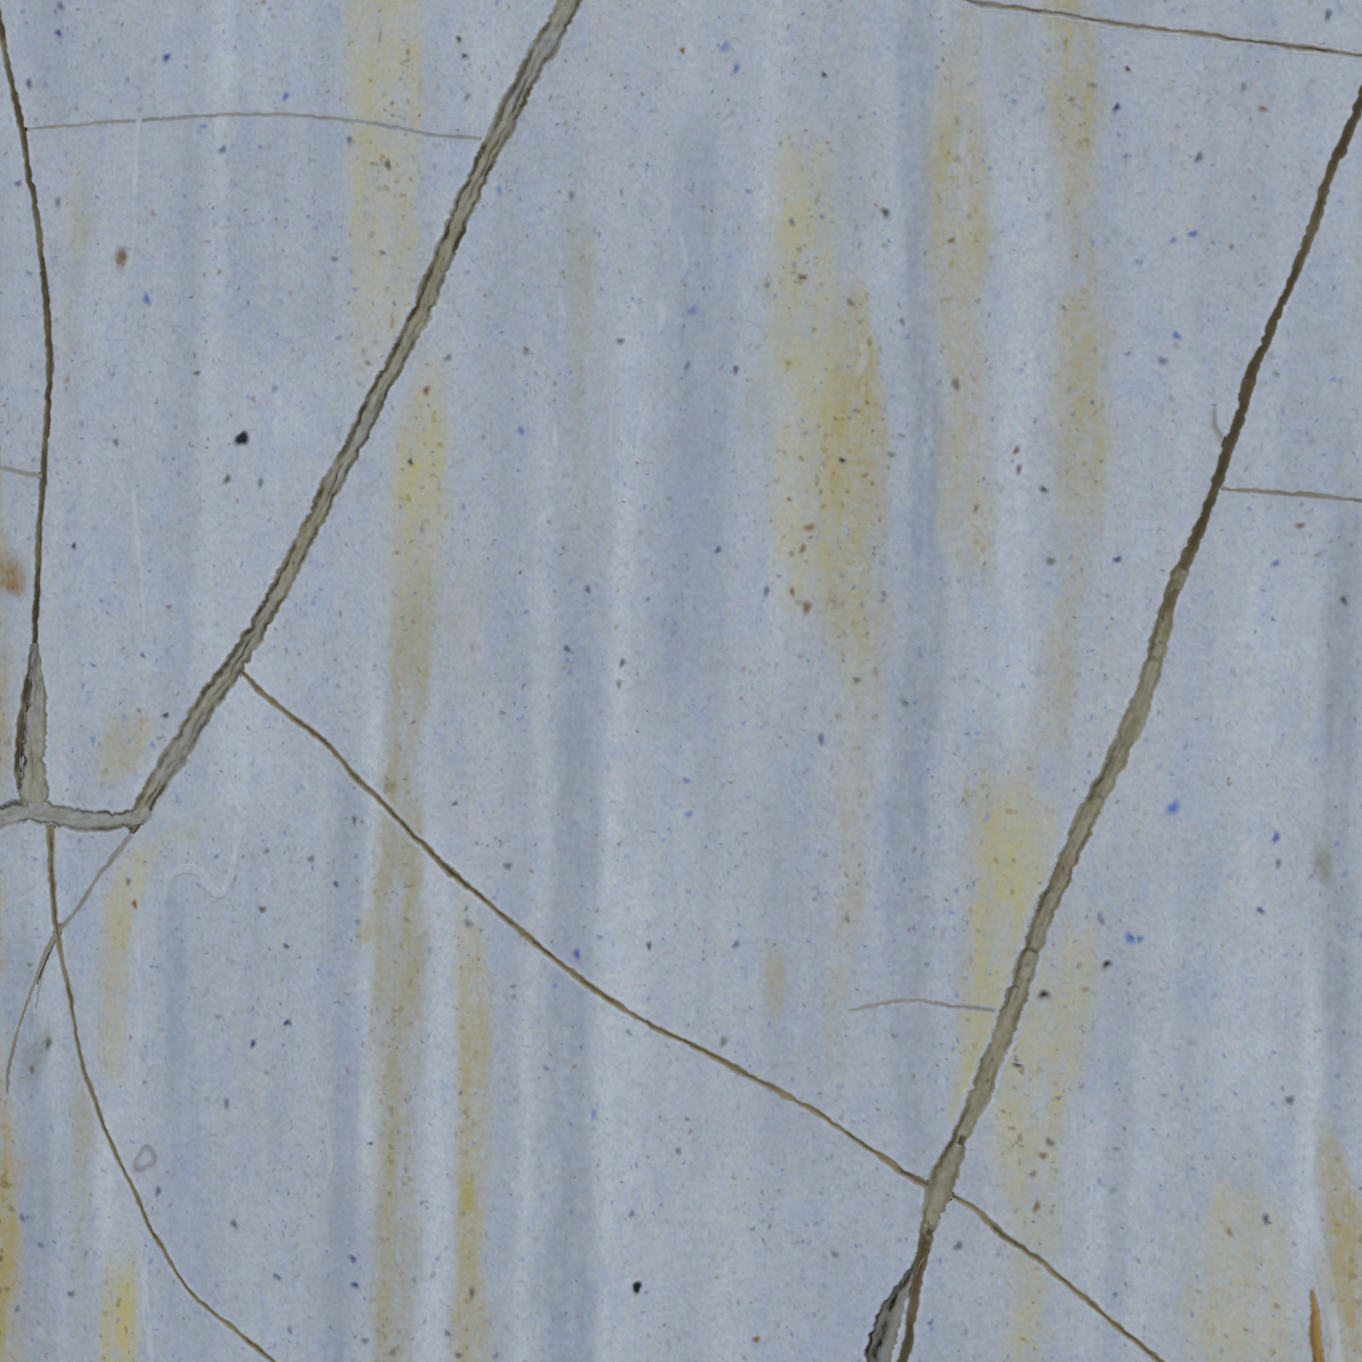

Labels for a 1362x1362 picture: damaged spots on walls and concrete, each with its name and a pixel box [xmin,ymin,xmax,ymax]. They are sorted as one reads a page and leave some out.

crack [952,0,1362,61]
crack [0,0,929,1362]
crack [845,62,1362,1362]
spalling [858,1254,925,1362]
rust [1304,1089,1362,1362]